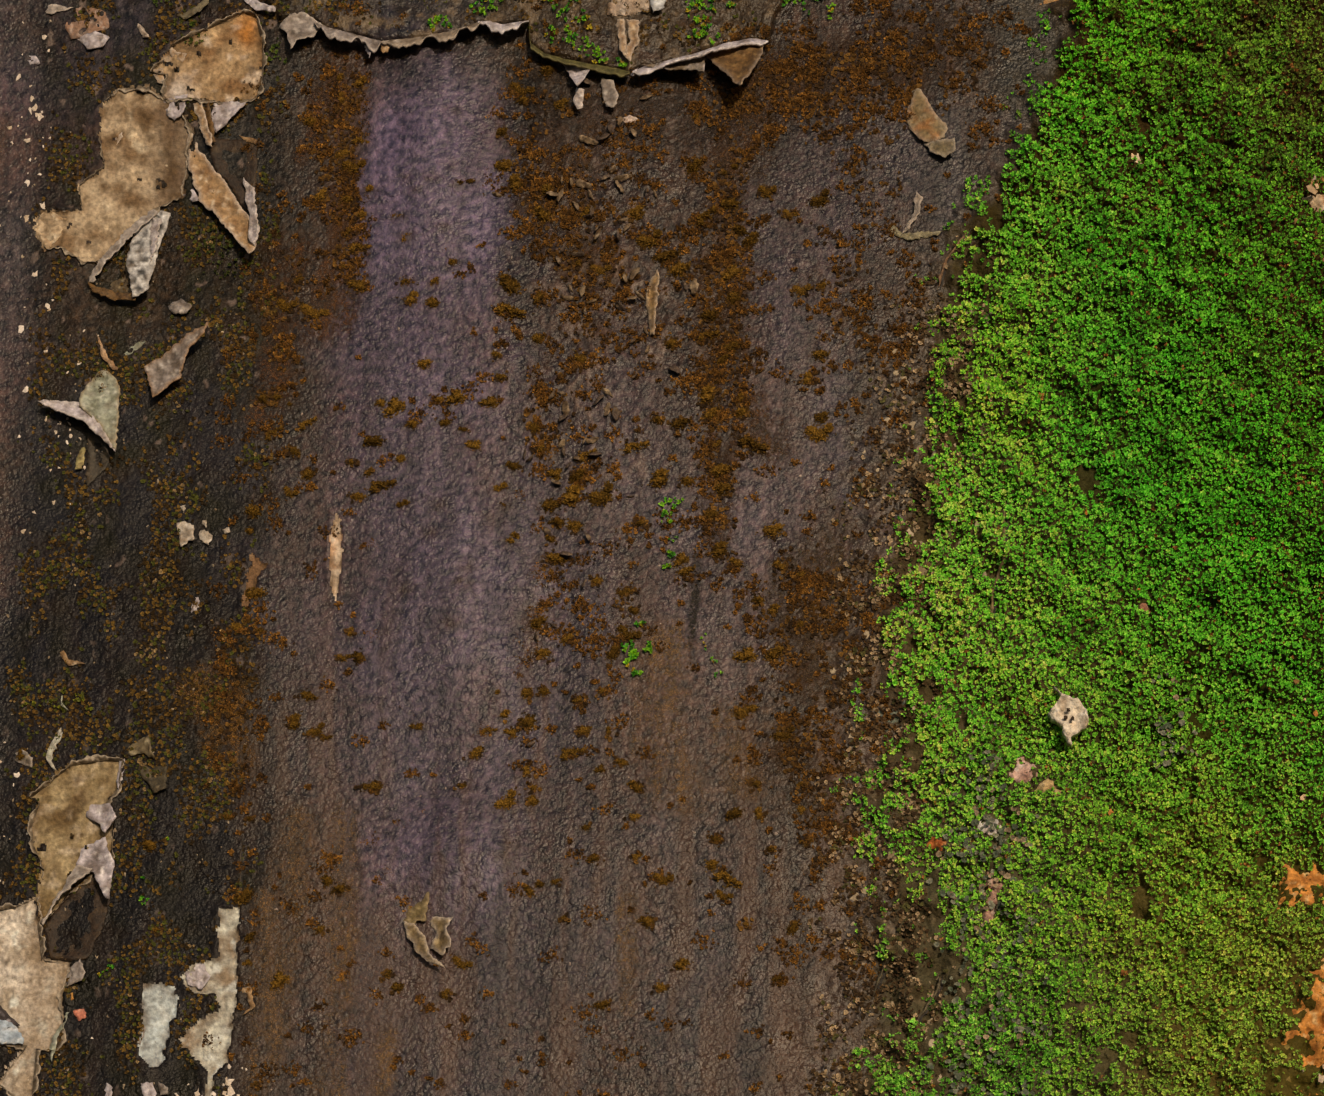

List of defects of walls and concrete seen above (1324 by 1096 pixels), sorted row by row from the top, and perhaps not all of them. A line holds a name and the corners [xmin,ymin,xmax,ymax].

peeling [33,0,768,301]
water stain [516,7,987,158]
peeling [38,333,146,487]
peeling [144,322,209,398]
peeling [168,299,192,314]
peeling [60,650,85,666]
water stain [637,553,700,804]
peeling [0,728,167,1096]
peeling [133,907,255,1096]
peeling [403,892,453,968]